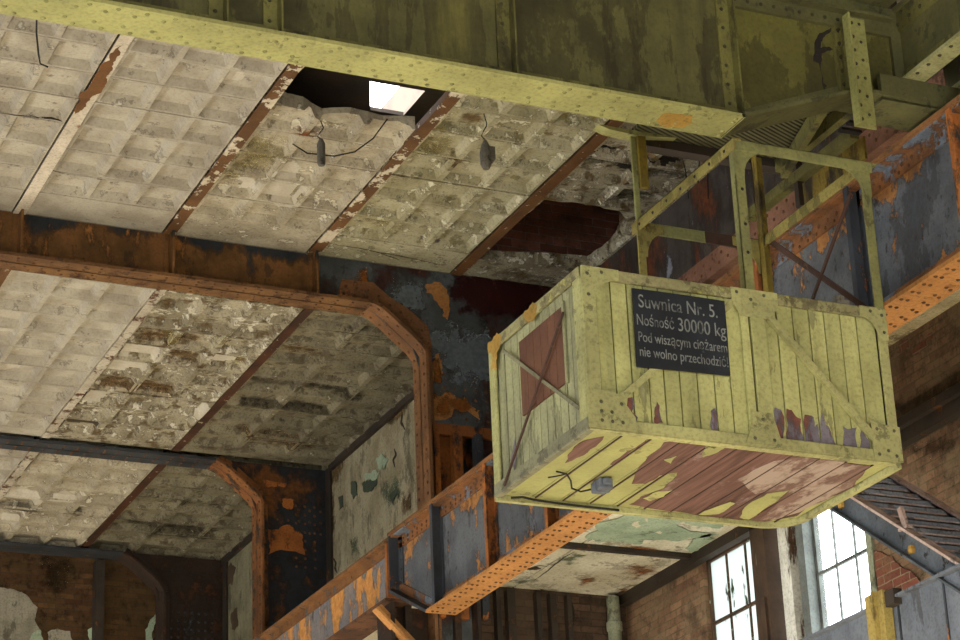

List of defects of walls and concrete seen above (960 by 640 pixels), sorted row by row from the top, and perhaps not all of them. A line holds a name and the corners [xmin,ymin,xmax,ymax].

rust [74,46,121,114]
spalling [647,155,680,166]
leakage [136,328,199,368]
leakage [100,376,173,398]
rust [263,480,294,509]
peeling [338,454,388,510]
peeling [585,441,818,552]
rust [268,525,305,555]
rust [619,566,655,591]
flaking render [0,587,72,640]
peeling [145,614,156,640]